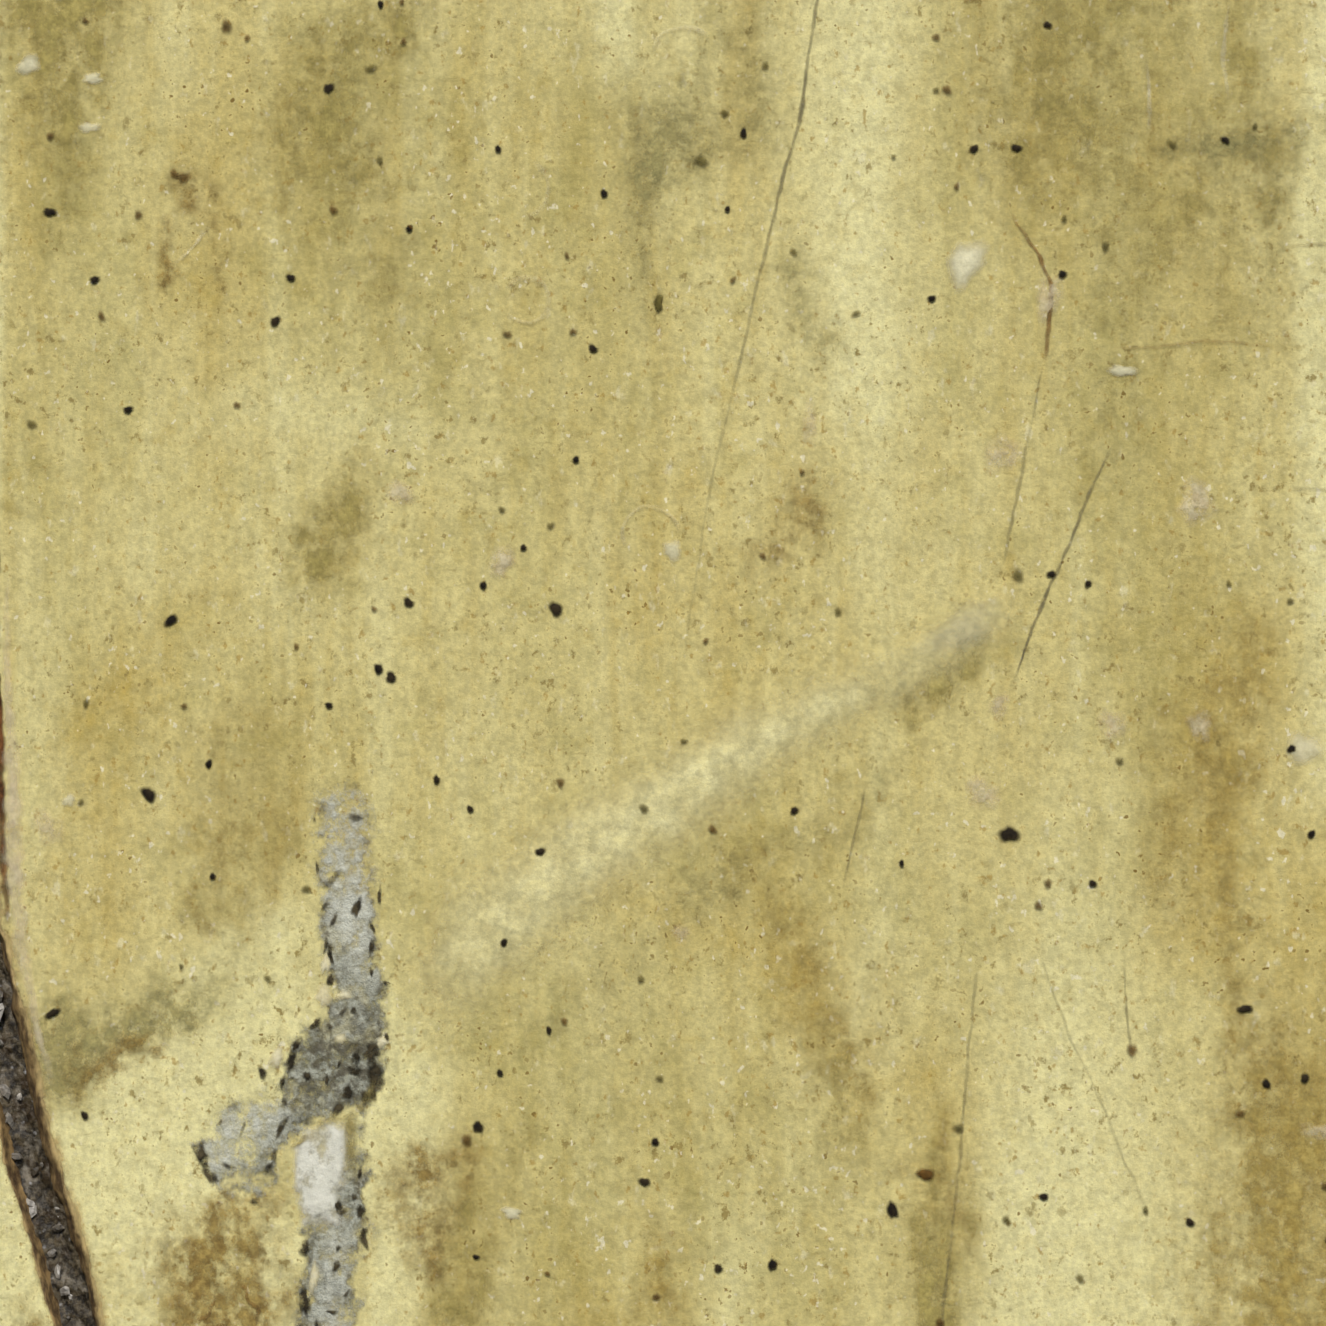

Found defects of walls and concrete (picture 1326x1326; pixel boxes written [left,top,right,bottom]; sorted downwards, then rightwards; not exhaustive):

leakage [10,0,107,180]
leakage [293,32,374,185]
leakage [1013,0,1122,155]
leakage [296,490,360,580]
crack [0,678,105,1326]
peeling [191,792,390,1326]
leakage [1240,1046,1326,1326]